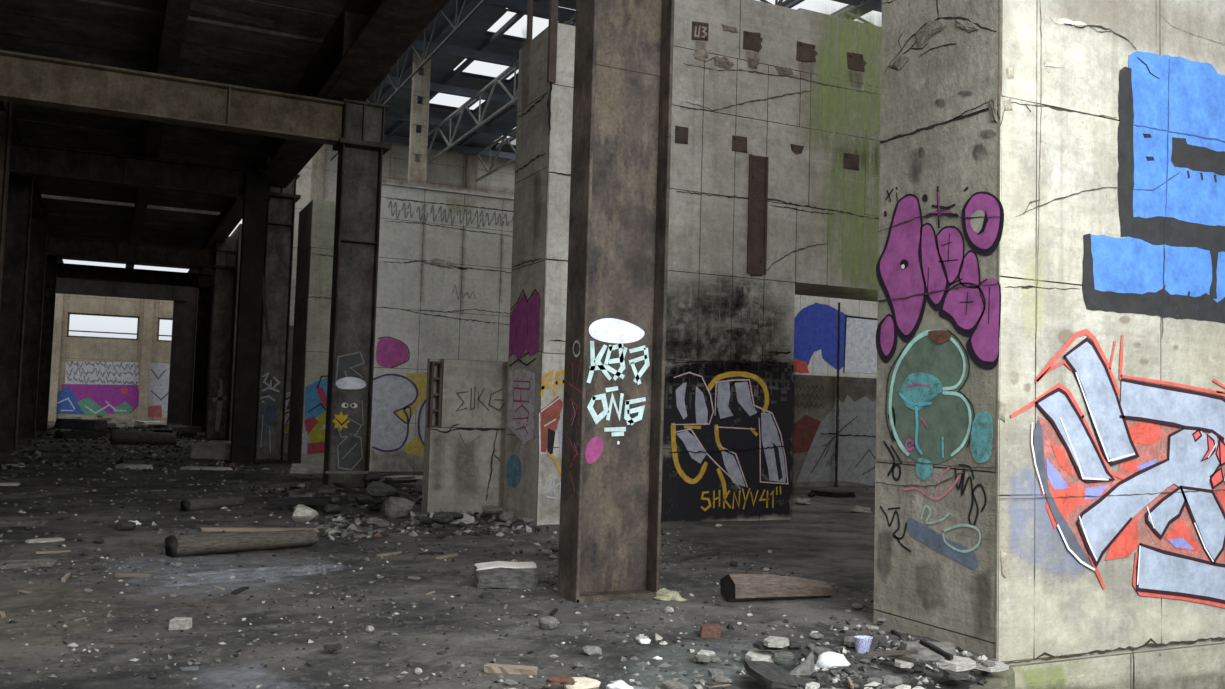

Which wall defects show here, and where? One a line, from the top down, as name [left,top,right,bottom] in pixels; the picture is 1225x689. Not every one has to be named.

damp [812,15,881,290]
crack [673,0,1225,381]